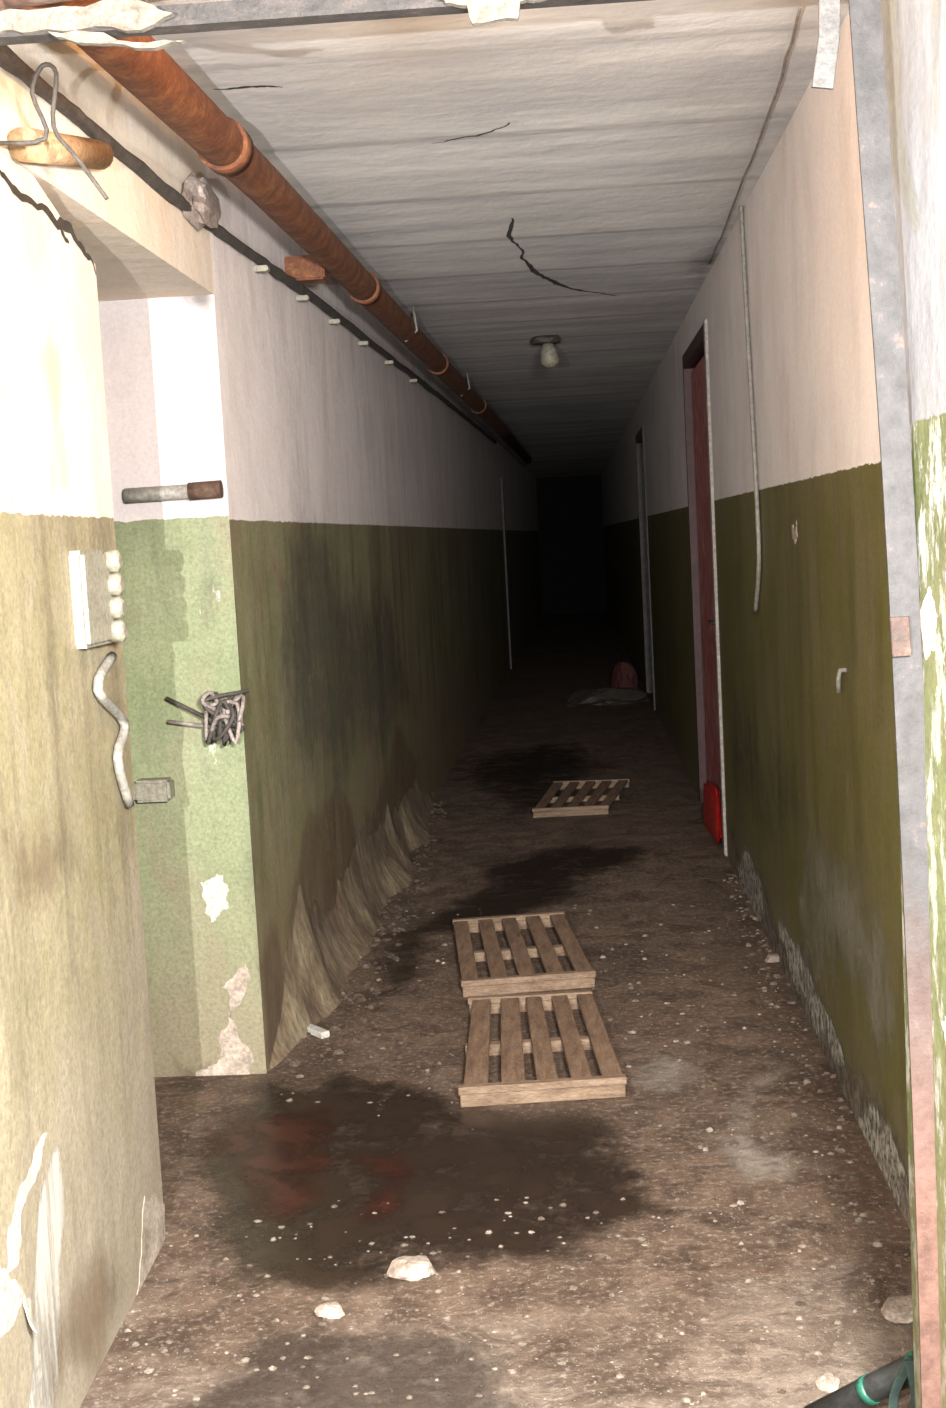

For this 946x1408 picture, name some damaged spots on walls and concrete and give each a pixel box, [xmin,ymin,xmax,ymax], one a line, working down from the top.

crack [506,218,615,296]
peeling [920,587,938,660]
spalling [200,875,229,922]
spalling [731,827,845,1067]
spalling [196,964,254,1076]
peeling [0,1132,47,1338]
leakage [207,1074,657,1290]